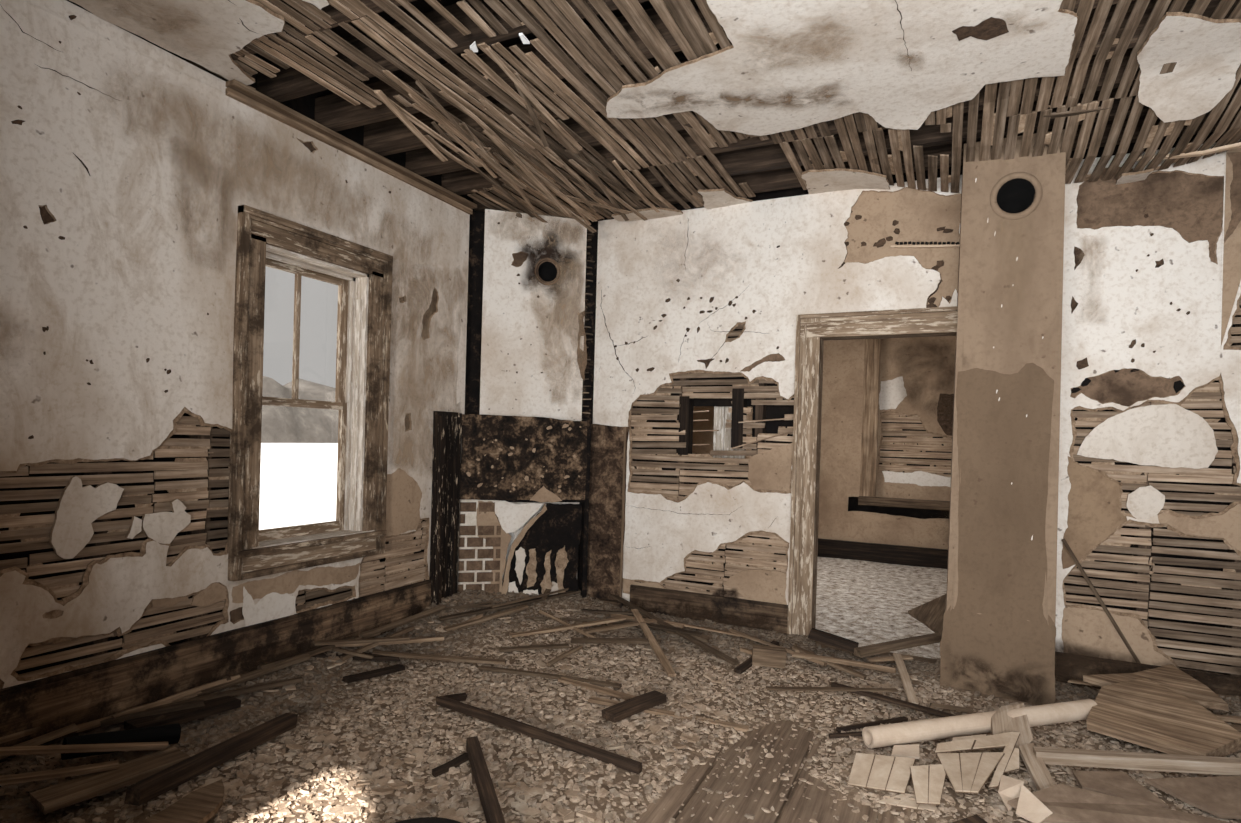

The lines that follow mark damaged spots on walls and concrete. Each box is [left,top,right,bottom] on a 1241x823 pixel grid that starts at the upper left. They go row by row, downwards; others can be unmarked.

flaking render [1076,152,1241,264]
crack [601,290,645,382]
flaking render [653,296,738,337]
crack [678,297,767,363]
flaking render [725,309,756,342]
flaking render [1223,294,1241,350]
flaking render [628,358,794,503]
flaking render [0,407,231,619]
flaking render [0,468,429,689]
flaking render [622,530,789,605]
flaking render [878,339,1241,705]